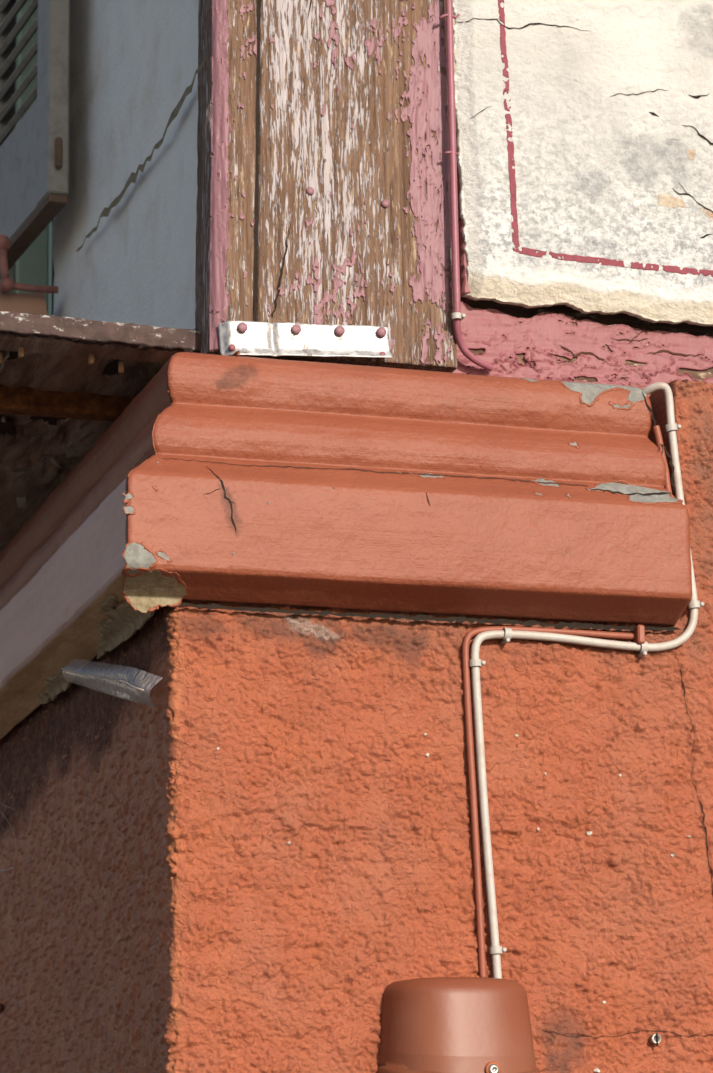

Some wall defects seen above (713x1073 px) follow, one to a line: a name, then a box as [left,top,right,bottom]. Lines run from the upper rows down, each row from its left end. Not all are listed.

crack [455,17,586,31]
crack [613,89,713,145]
peeling [209,0,274,351]
peeling [314,0,713,411]
crack [674,183,713,238]
peeling [268,218,370,325]
peeling [122,490,136,515]
crack [163,392,676,530]
peeling [585,480,683,505]
peeling [96,541,189,659]
spalling [38,669,72,704]
crack [179,602,713,885]